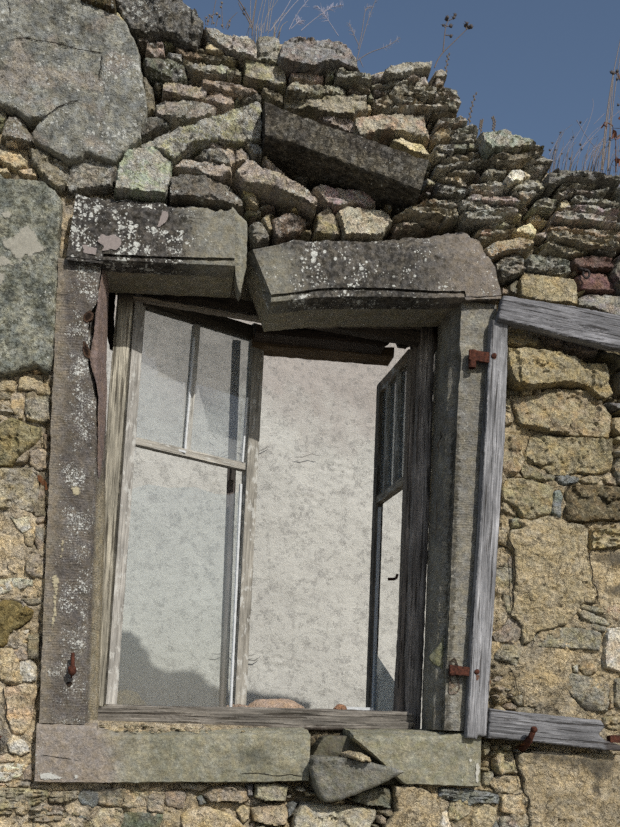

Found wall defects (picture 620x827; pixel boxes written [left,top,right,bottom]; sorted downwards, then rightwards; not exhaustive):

crack [12,38,102,79]
crack [499,529,516,612]
crack [584,554,599,604]